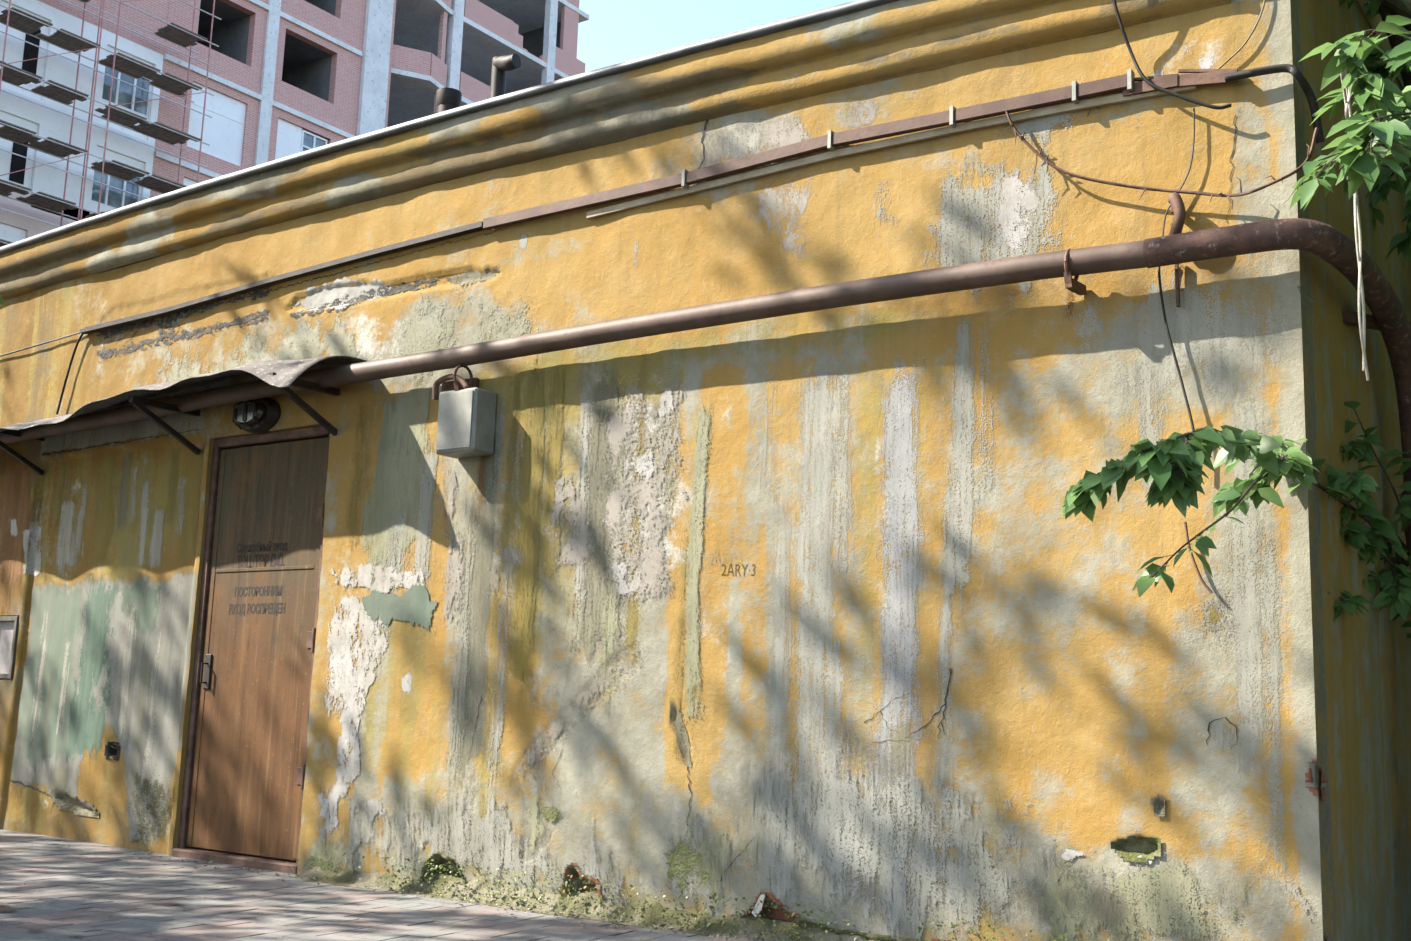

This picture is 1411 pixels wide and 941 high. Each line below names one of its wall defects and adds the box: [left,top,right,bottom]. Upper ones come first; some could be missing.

water stain [868,140,1074,270]
spalling [96,282,270,362]
spalling [288,266,501,320]
water stain [40,279,565,577]
peeling [538,368,691,611]
water stain [30,607,72,777]
water stain [114,600,185,828]
peeling [315,471,527,841]
water stain [310,256,1299,941]
crack [864,668,952,743]
spalling [1061,848,1092,861]
spalling [1111,836,1166,866]